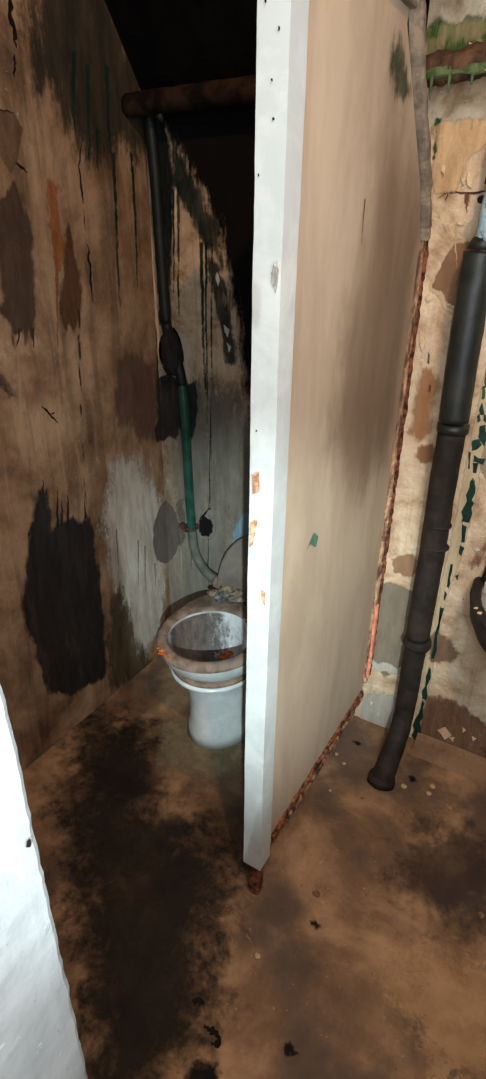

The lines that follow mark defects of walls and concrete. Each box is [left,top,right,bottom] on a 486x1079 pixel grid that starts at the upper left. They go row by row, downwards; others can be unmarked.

crack [8,0,18,76]
peeling [0,109,22,172]
flaking render [432,118,486,194]
leakage [0,181,35,347]
leakage [30,0,250,614]
flaking render [409,330,438,441]
leakage [22,481,153,696]
peeling [412,374,486,740]